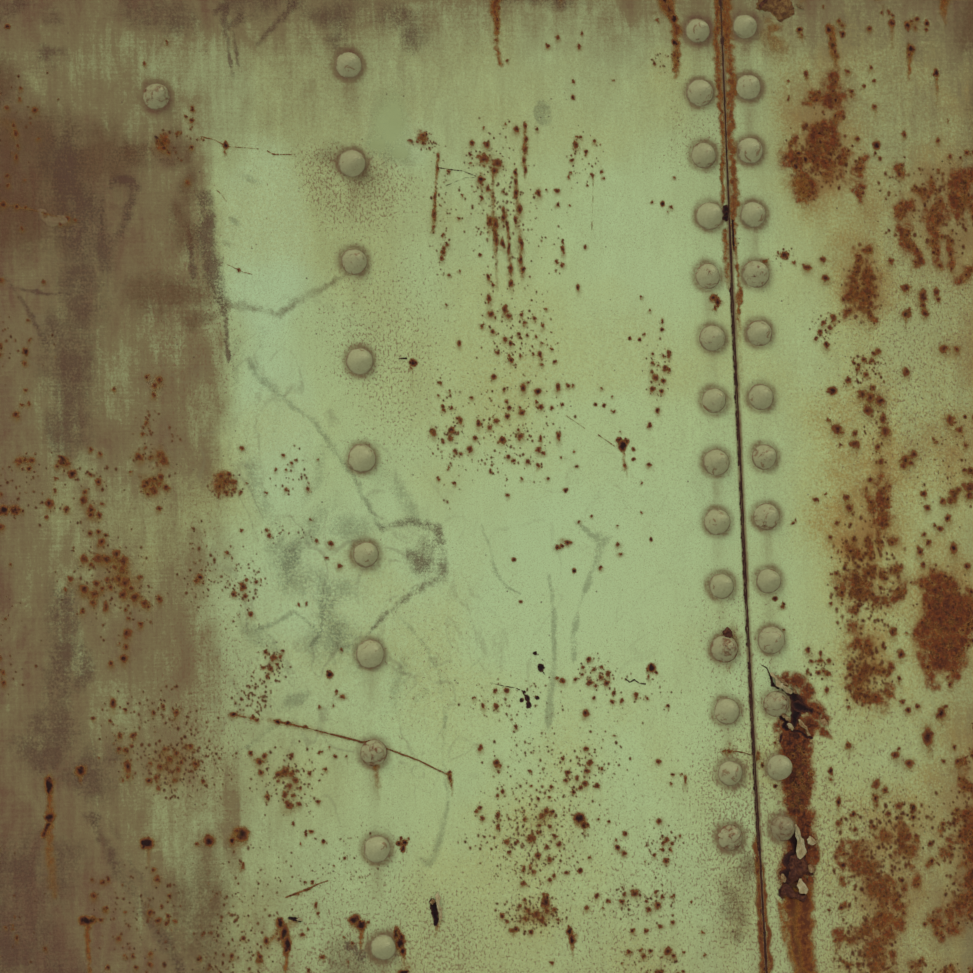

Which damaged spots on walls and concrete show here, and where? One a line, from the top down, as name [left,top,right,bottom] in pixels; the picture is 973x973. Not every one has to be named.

corrosion [780,19,882,204]
corrosion [407,117,585,497]
spalling [729,282,740,466]
corrosion [878,150,973,285]
spalling [739,483,748,647]
corrosion [91,649,348,816]
peeling [429,892,442,929]
corrosion [458,653,649,951]
spalling [747,662,759,851]
spalling [762,665,828,742]
peeling [778,824,817,902]
corrosion [752,348,973,973]